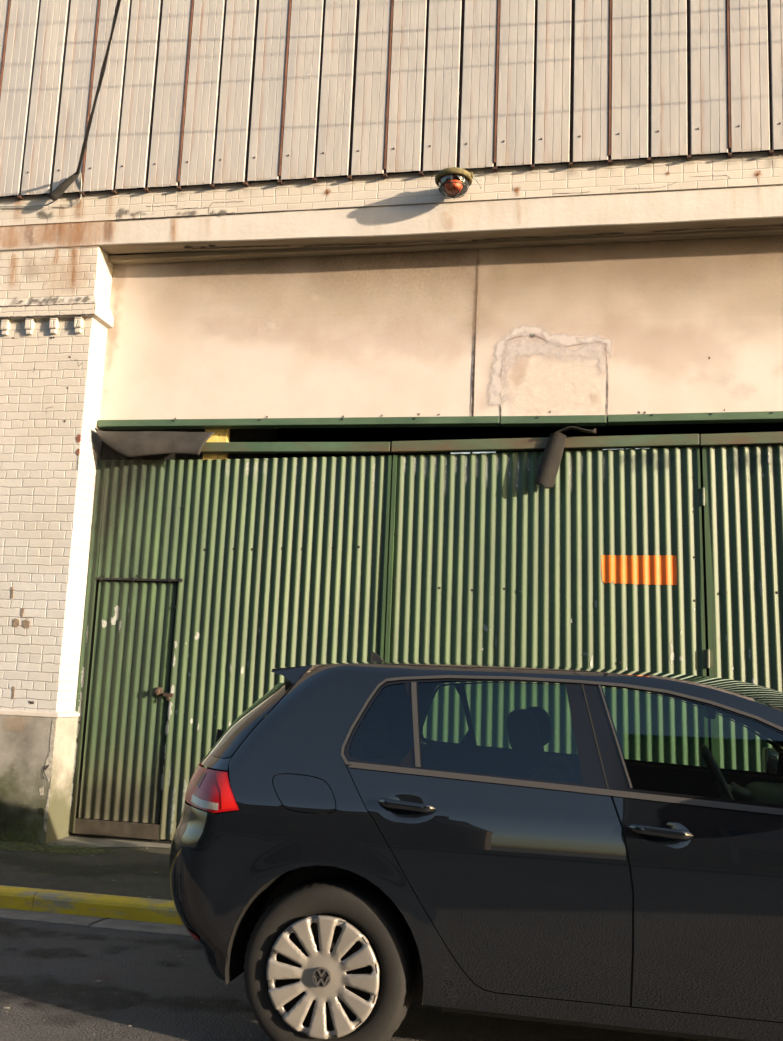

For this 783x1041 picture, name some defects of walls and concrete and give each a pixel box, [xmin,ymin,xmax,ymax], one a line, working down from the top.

peeling [489,325,612,408]
peeling [102,605,130,631]
peeling [161,685,188,834]